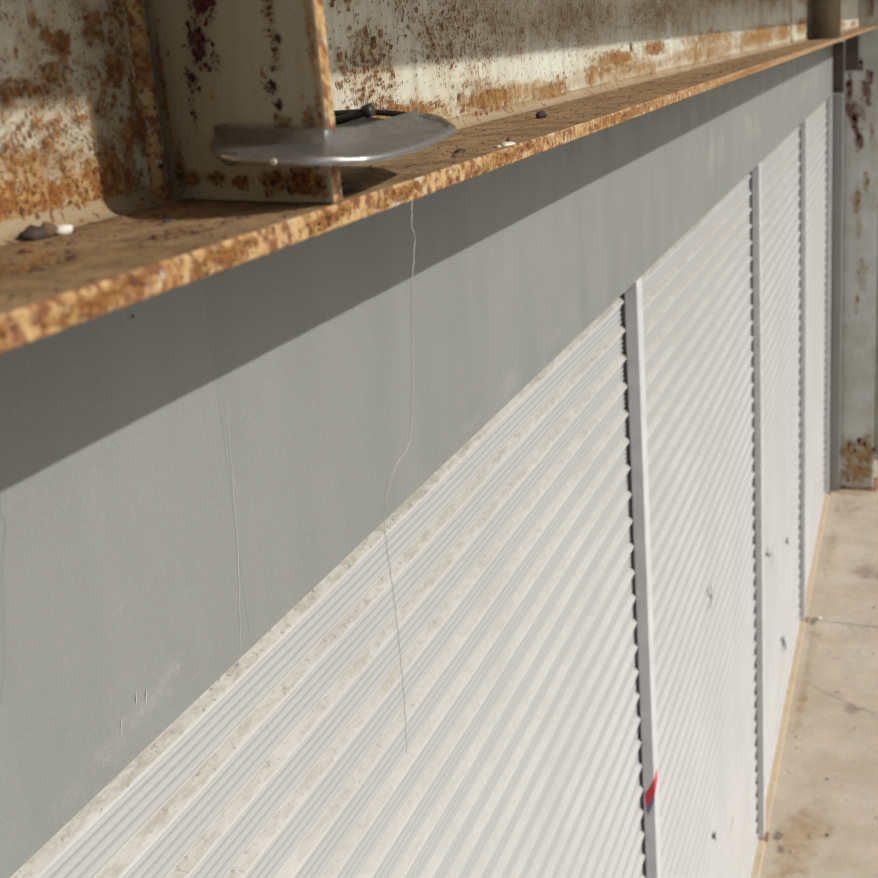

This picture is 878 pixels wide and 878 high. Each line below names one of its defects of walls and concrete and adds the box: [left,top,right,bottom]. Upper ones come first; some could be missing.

corrosion [0,0,149,226]
corrosion [155,33,329,198]
corrosion [261,0,284,71]
corrosion [326,0,810,119]
corrosion [311,205,351,233]
corrosion [840,431,876,494]